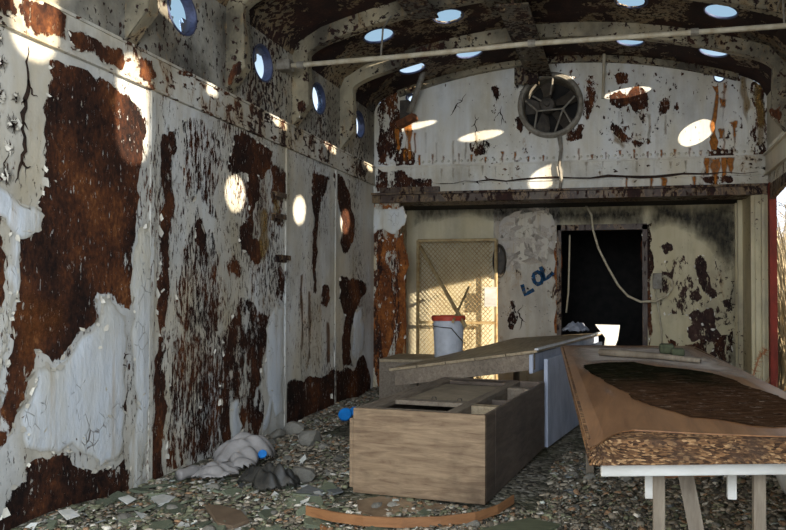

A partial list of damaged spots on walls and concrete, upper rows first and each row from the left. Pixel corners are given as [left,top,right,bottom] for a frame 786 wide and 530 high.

corrosion [0,0,125,70]
crack [0,30,37,187]
corrosion [375,92,433,192]
corrosion [692,83,738,185]
corrosion [741,77,782,155]
corrosion [0,59,146,446]
peeling [20,221,156,488]
corrosion [287,171,409,423]
peeling [493,369,544,382]
peeling [493,207,560,343]
corrosion [640,223,734,365]